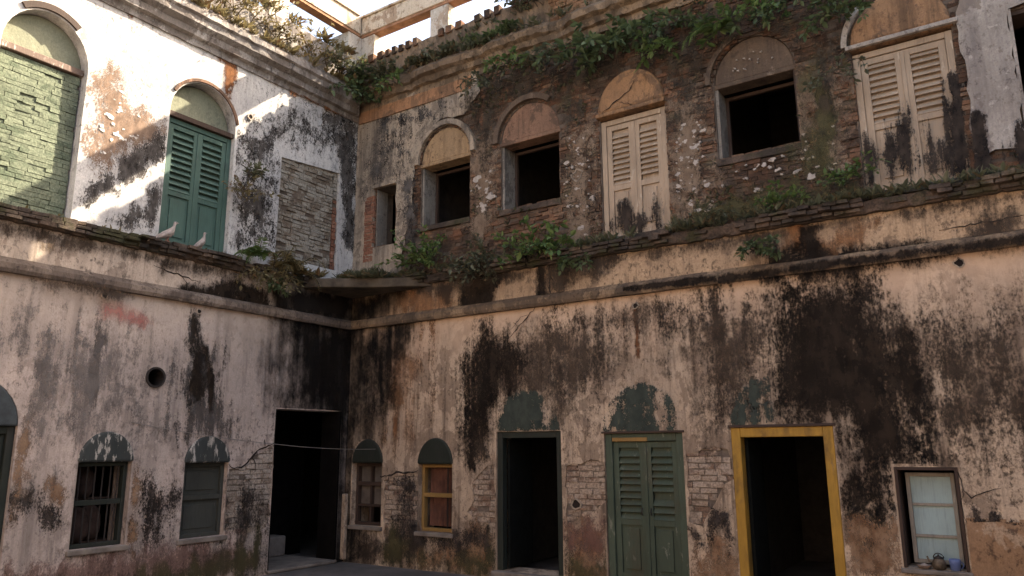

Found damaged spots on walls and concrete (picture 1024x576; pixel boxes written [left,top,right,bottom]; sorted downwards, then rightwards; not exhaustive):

flaking render [80,57,168,179]
water stain [230,0,958,254]
water stain [862,67,1024,189]
water stain [0,278,241,535]
water stain [97,467,270,576]
flaking render [224,446,273,537]
crack [229,439,274,469]
flaking render [468,464,496,529]
flaking render [566,459,606,522]
flaking render [686,447,734,526]
water stain [413,190,1024,576]